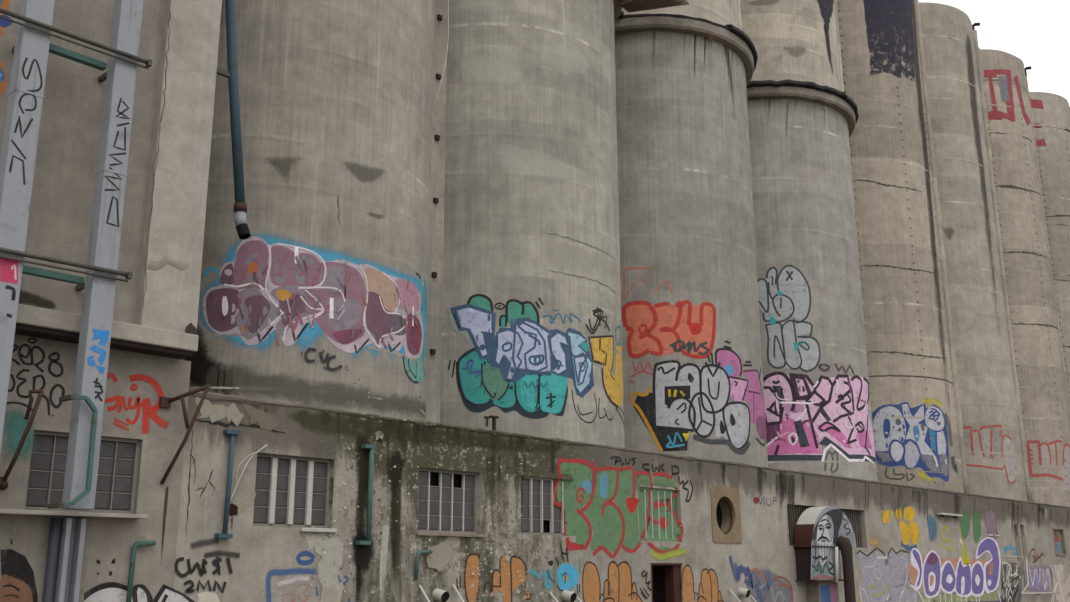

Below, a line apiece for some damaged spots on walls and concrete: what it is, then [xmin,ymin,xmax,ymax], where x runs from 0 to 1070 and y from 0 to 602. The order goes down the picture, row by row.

crack [143,0,171,304]
spalling [194,397,285,433]
leakage [186,330,433,600]